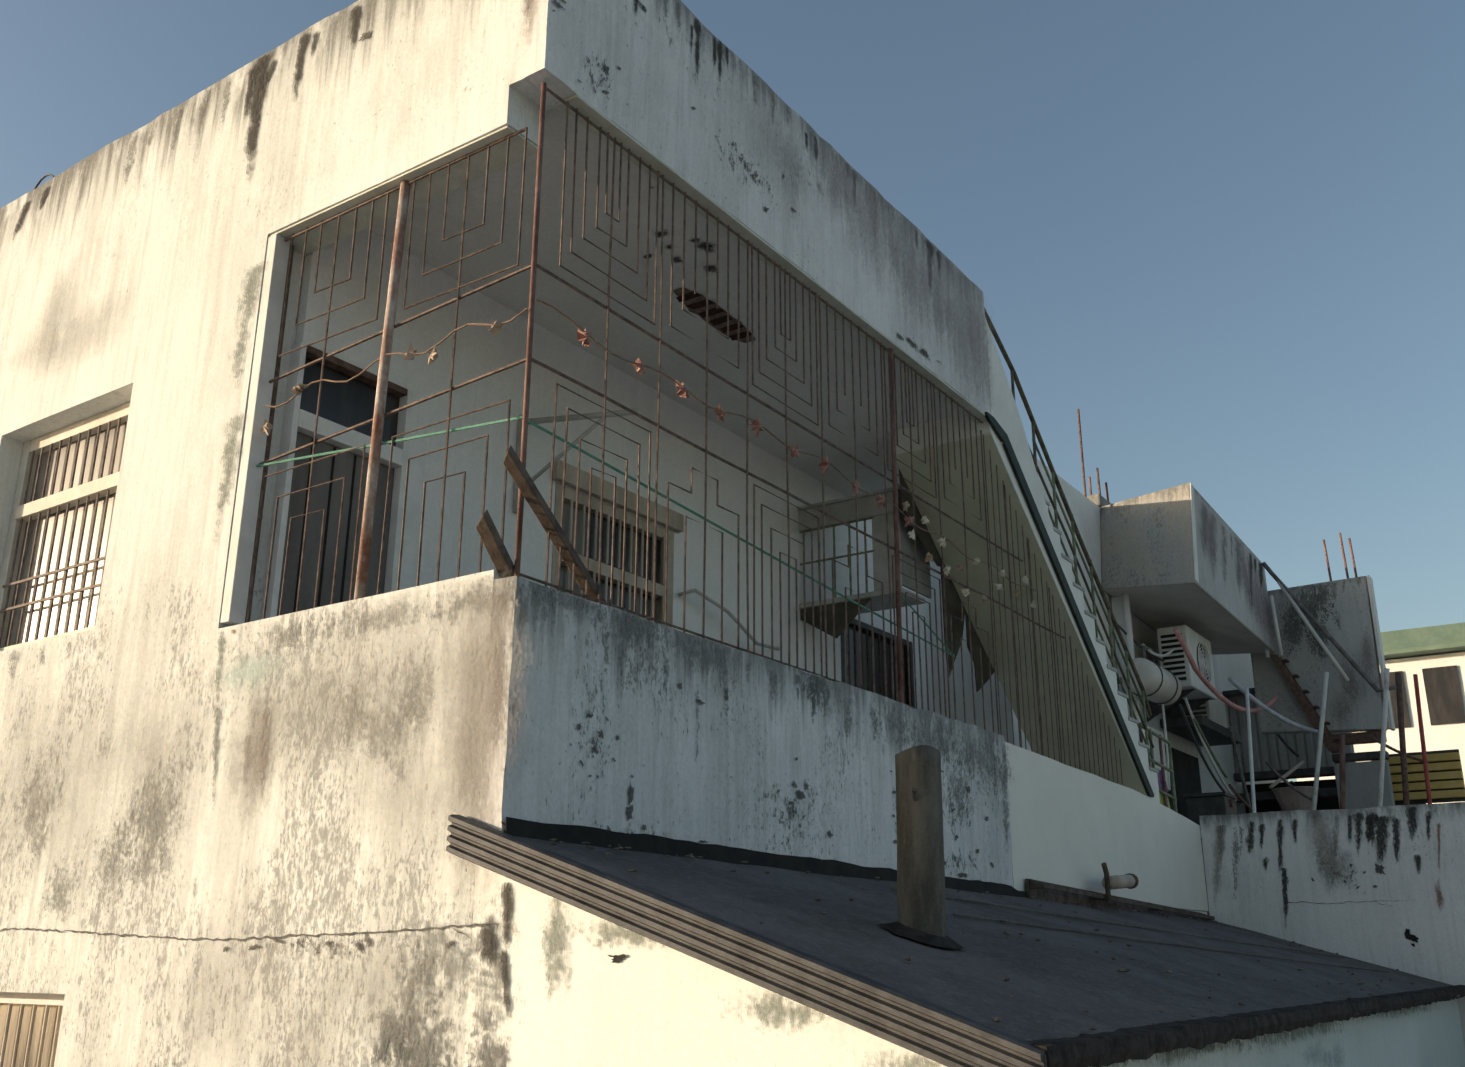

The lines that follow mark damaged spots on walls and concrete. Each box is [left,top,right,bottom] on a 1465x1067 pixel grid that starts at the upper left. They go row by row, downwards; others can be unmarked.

leakage [293,32,318,96]
leakage [348,6,371,49]
leakage [635,0,729,81]
leakage [125,54,276,184]
leakage [13,186,50,236]
leakage [1203,506,1345,665]
leakage [212,633,225,798]
leakage [245,575,778,803]
leakage [8,743,192,922]
leakage [1216,819,1297,924]
leakage [1317,807,1431,877]
crack [0,922,496,966]